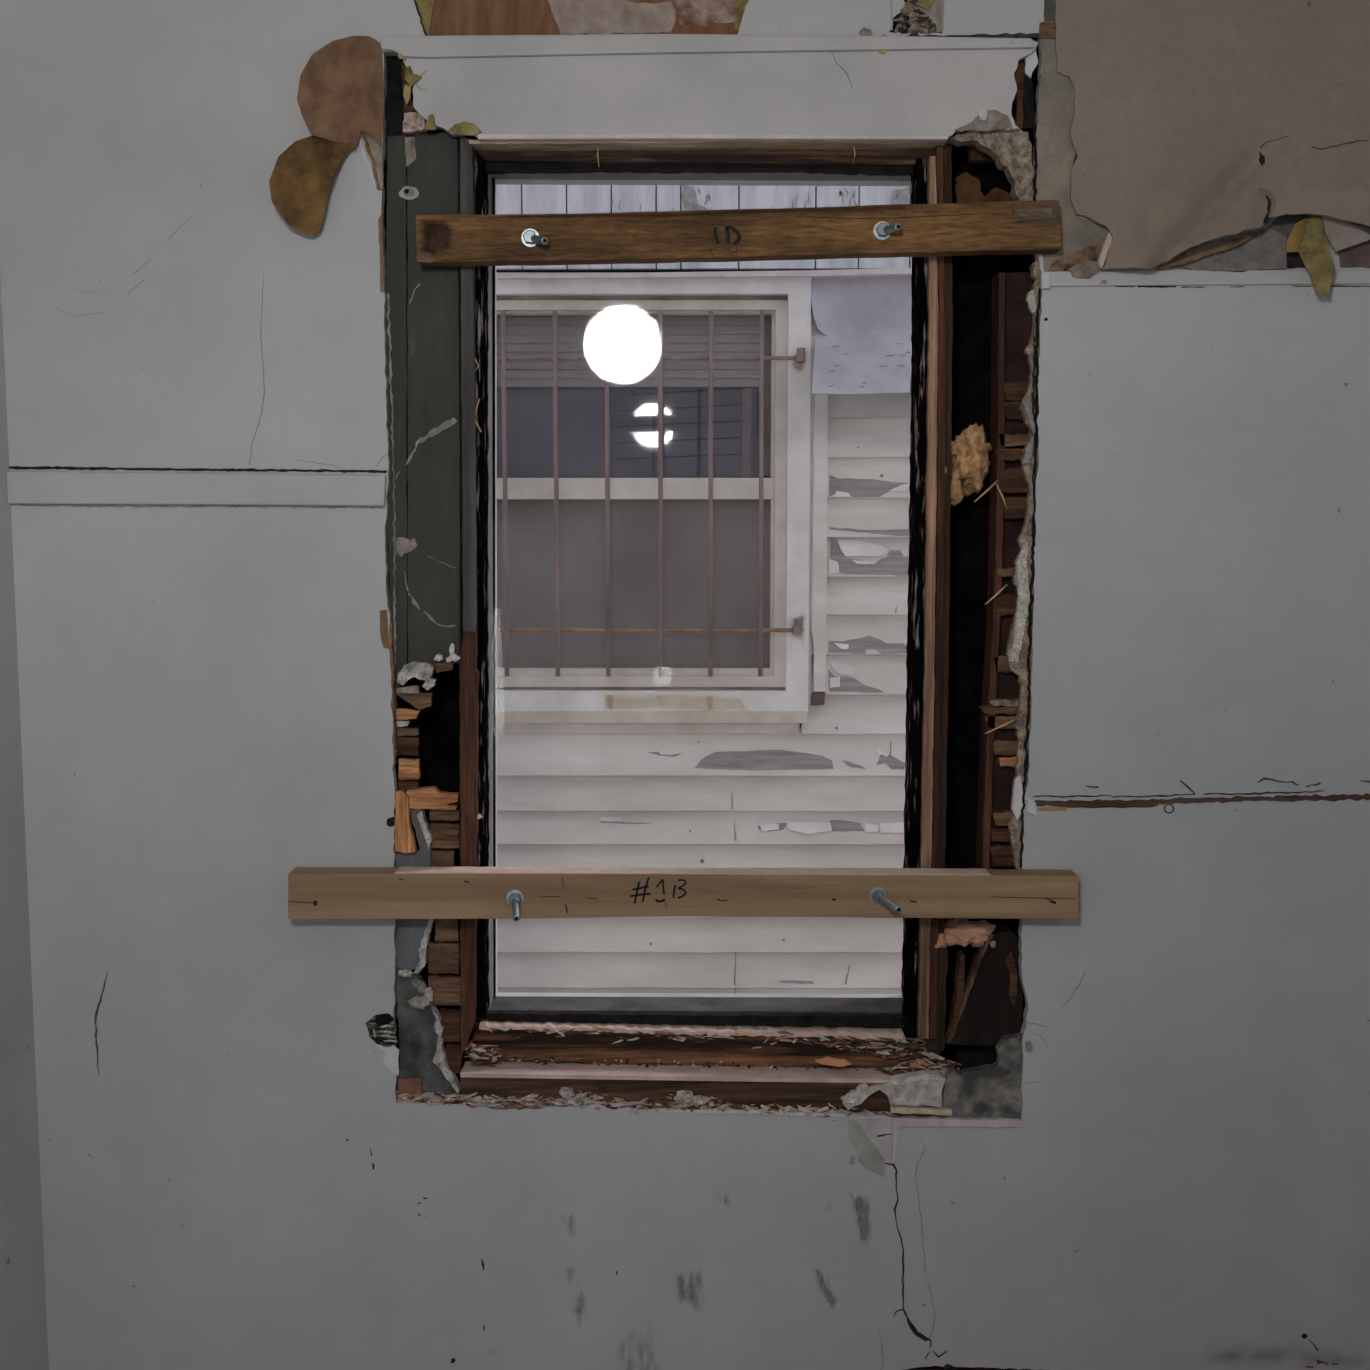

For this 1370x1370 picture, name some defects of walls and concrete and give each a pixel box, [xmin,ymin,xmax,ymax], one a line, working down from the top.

peeling [414,0,749,36]
peeling [269,36,481,293]
spalling [945,0,1112,869]
peeling [380,610,389,649]
spalling [395,637,463,867]
peeling [1257,777,1321,788]
flaking render [365,919,474,1097]
flaking render [840,944,1025,1178]
spalling [944,918,1019,938]
crack [877,1137,936,1370]